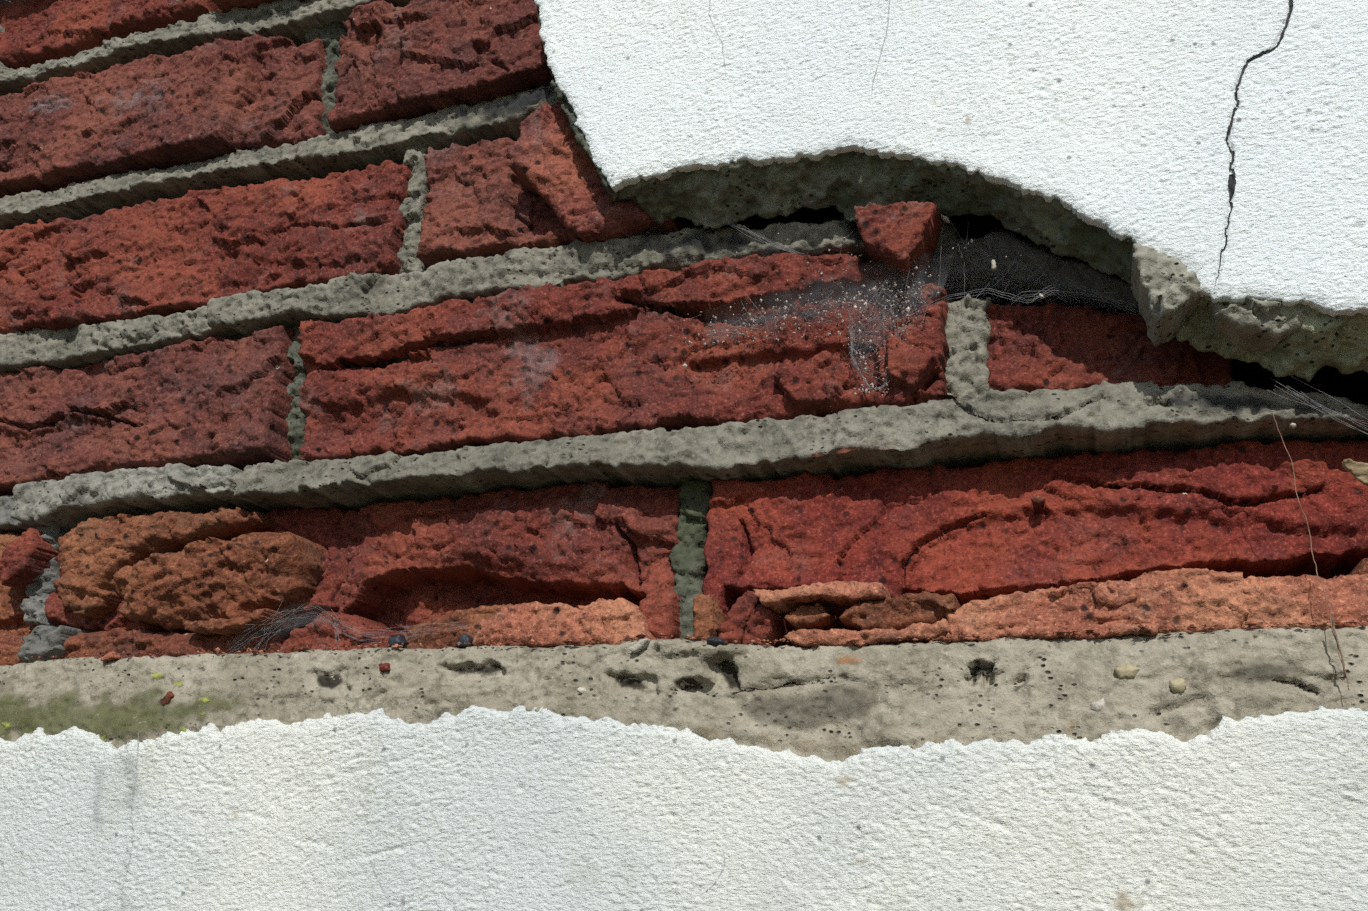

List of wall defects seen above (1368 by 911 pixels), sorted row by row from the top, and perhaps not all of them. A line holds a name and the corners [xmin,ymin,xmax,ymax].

spalling [537,7,1368,382]
crack [1213,0,1293,295]
peeling [0,506,1368,762]